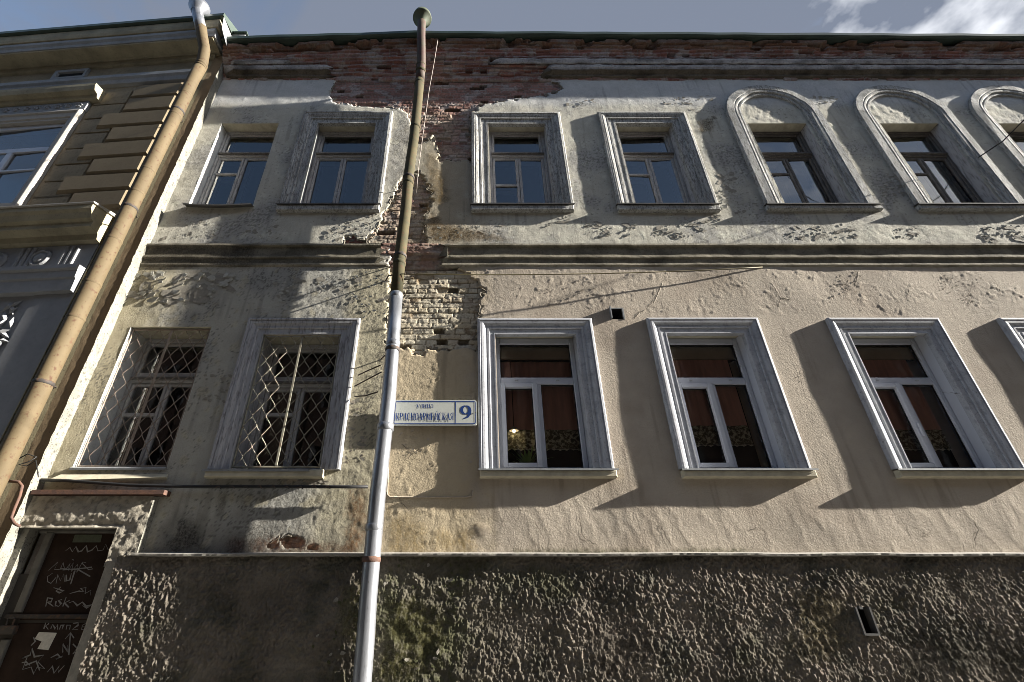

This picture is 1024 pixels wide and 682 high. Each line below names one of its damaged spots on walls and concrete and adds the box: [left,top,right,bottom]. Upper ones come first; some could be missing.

flaking render [324,173,505,244]
peeling [785,223,858,240]
peeling [981,225,1024,243]
flaking render [273,271,485,356]
flaking render [267,536,317,550]